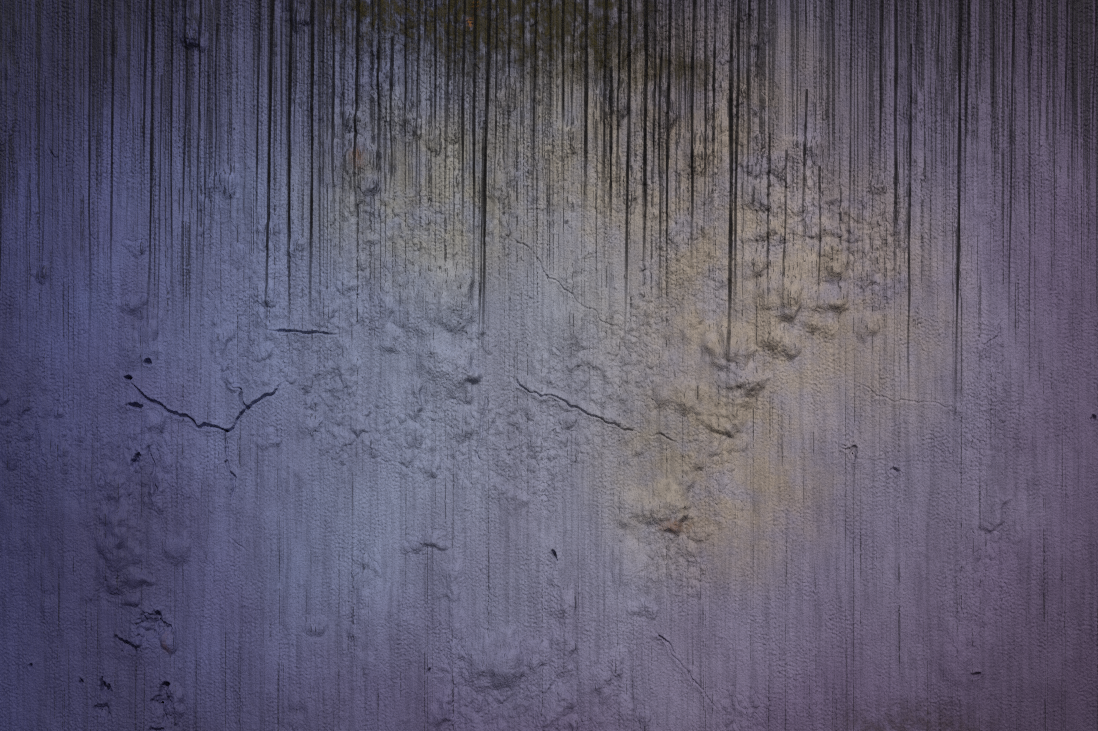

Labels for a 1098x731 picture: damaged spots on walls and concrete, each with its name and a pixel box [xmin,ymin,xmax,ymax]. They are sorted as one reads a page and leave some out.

peeling [183,0,923,347]
crack [122,371,294,516]
crack [495,364,689,454]
crack [644,611,732,725]